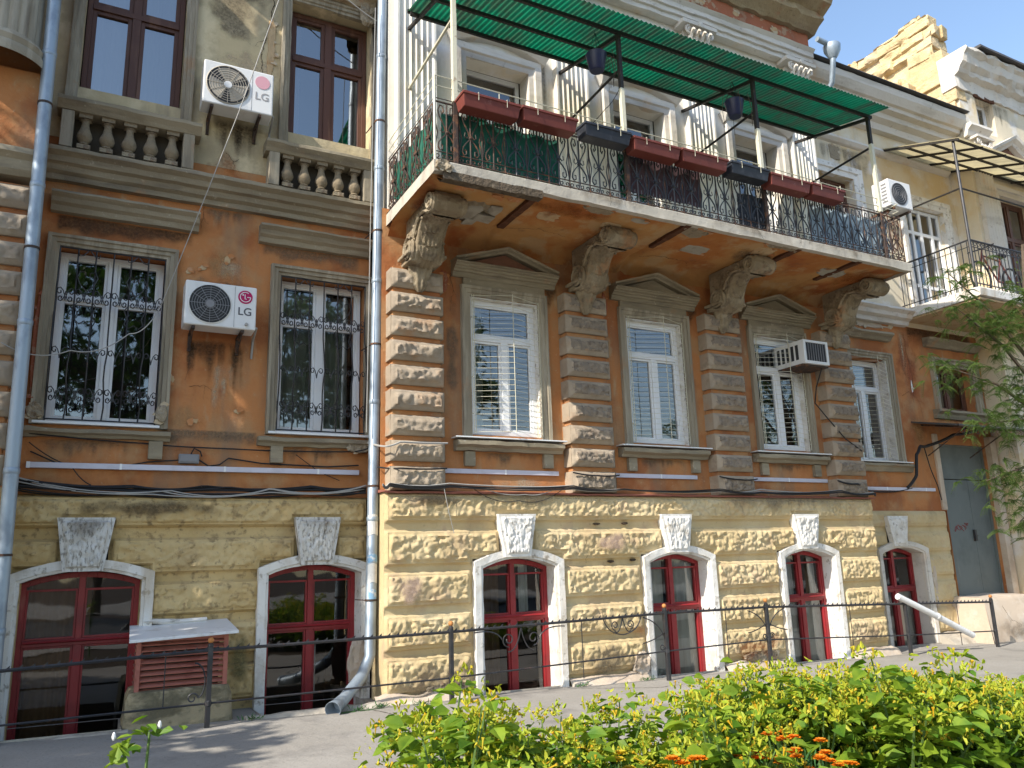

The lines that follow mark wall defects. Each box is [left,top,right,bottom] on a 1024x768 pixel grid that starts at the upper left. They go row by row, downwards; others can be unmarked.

water stain [220,122,253,146]